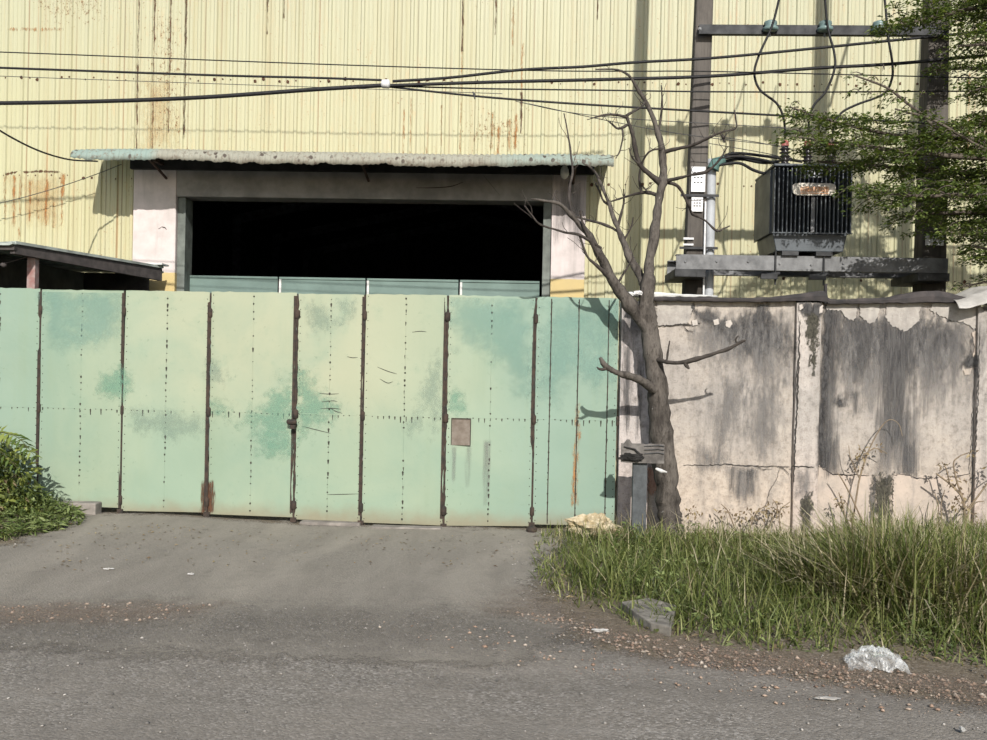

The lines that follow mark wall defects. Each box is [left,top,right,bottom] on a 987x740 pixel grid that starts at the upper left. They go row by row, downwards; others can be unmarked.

corrosion [136,0,201,149]
corrosion [459,0,529,152]
corrosion [4,170,65,225]
corrosion [201,481,215,513]
peeling [656,301,698,326]
water stain [691,302,797,377]
crack [691,322,869,509]
water stain [809,305,983,475]
peeling [819,303,981,375]
crack [895,337,981,515]